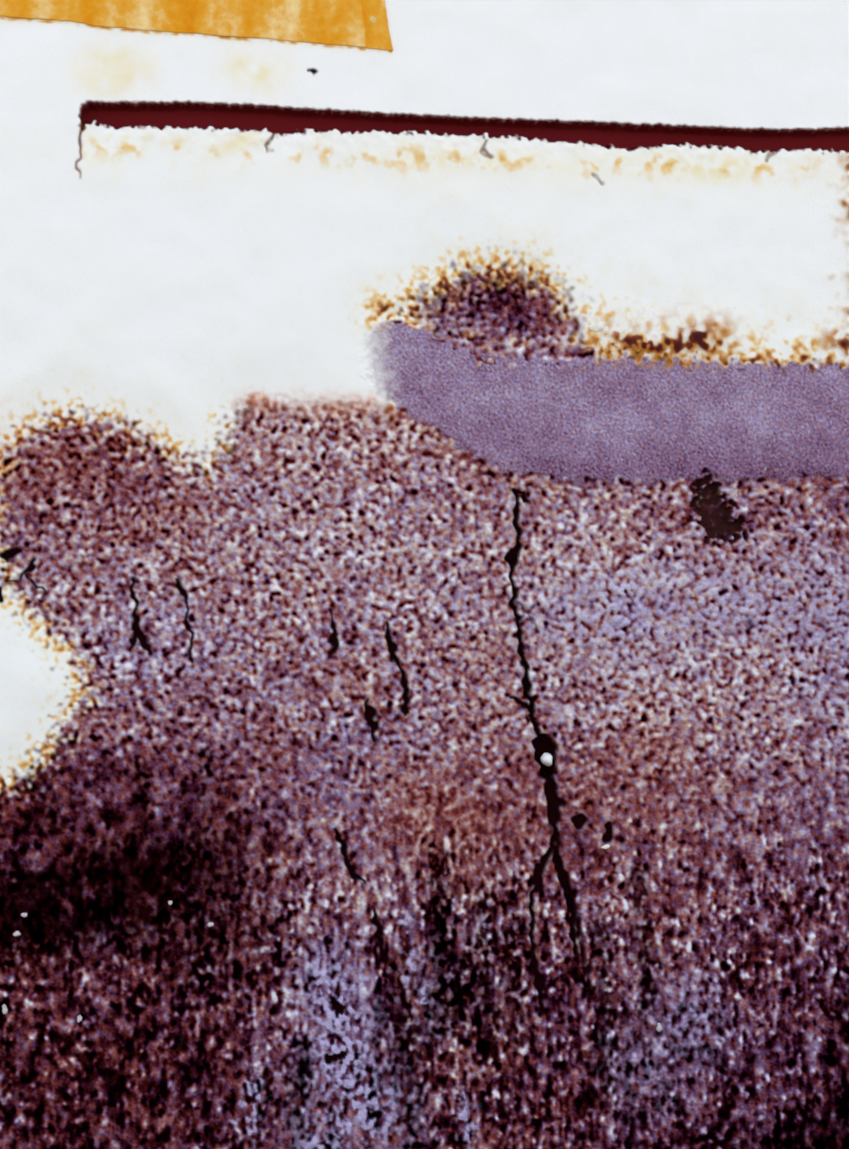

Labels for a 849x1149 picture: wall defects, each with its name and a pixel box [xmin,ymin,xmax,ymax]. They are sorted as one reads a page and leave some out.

crack [126,574,152,658]
crack [173,577,195,665]
crack [326,608,341,657]
crack [361,620,413,744]
crack [502,487,543,733]
water stain [585,579,833,636]
water stain [0,750,245,964]
water stain [283,843,525,1149]
crack [527,778,594,1020]
water stain [591,906,616,1096]
water stain [628,865,662,1009]
water stain [241,1080,263,1135]